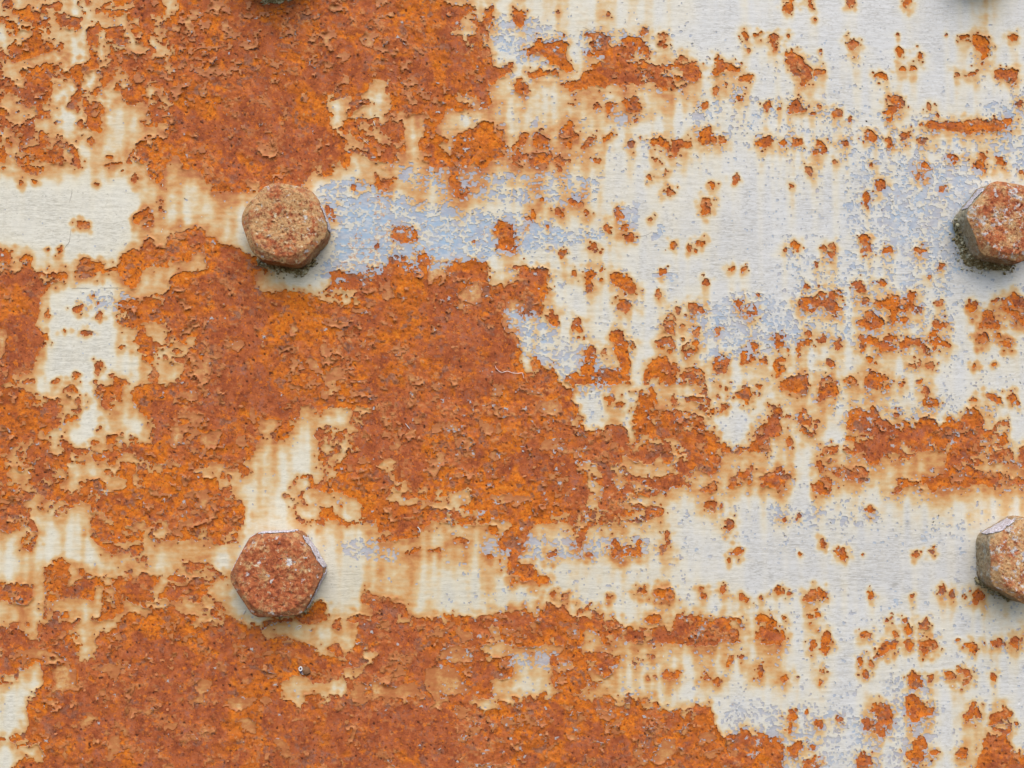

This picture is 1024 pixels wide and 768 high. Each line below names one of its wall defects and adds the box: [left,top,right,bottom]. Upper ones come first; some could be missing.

peeling [315,164,605,284]
peeling [690,90,1024,361]
corrosion [771,236,854,424]
corrosion [840,225,966,401]
corrosion [955,278,1024,379]
peeling [837,398,967,430]
peeling [509,653,560,668]
peeling [482,537,650,561]
corrosion [650,552,715,614]
corrosion [707,508,851,758]
corrosion [833,367,1024,768]
peeling [725,676,941,768]